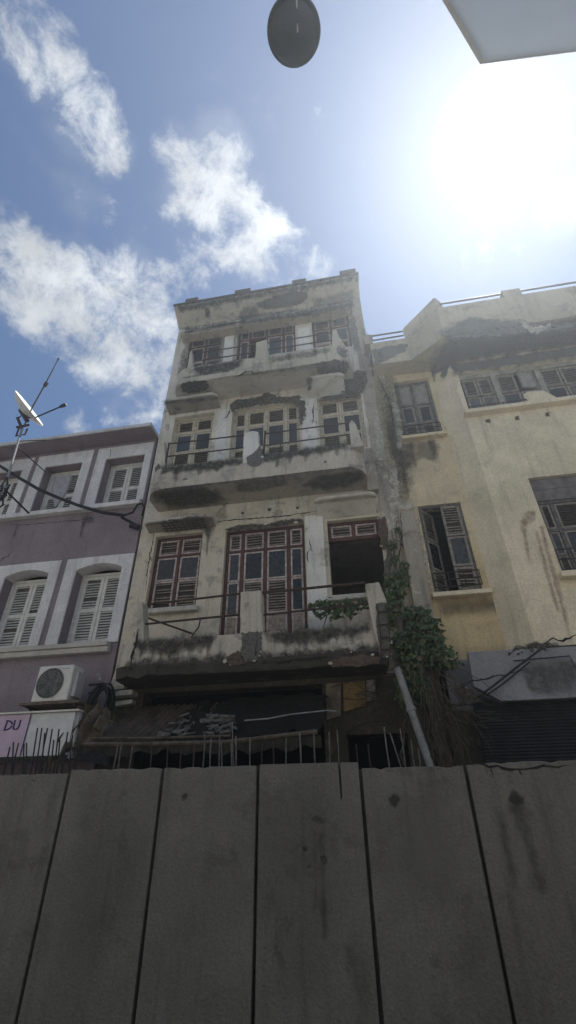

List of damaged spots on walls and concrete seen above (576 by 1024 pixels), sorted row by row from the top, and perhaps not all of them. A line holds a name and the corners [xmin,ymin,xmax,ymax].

spalling [181,380,209,393]
spalling [229,342,385,425]
water stain [376,376,409,498]
flaking render [246,445,264,466]
spalling [160,514,207,532]
flaking render [240,632,262,663]
water stain [252,623,379,663]